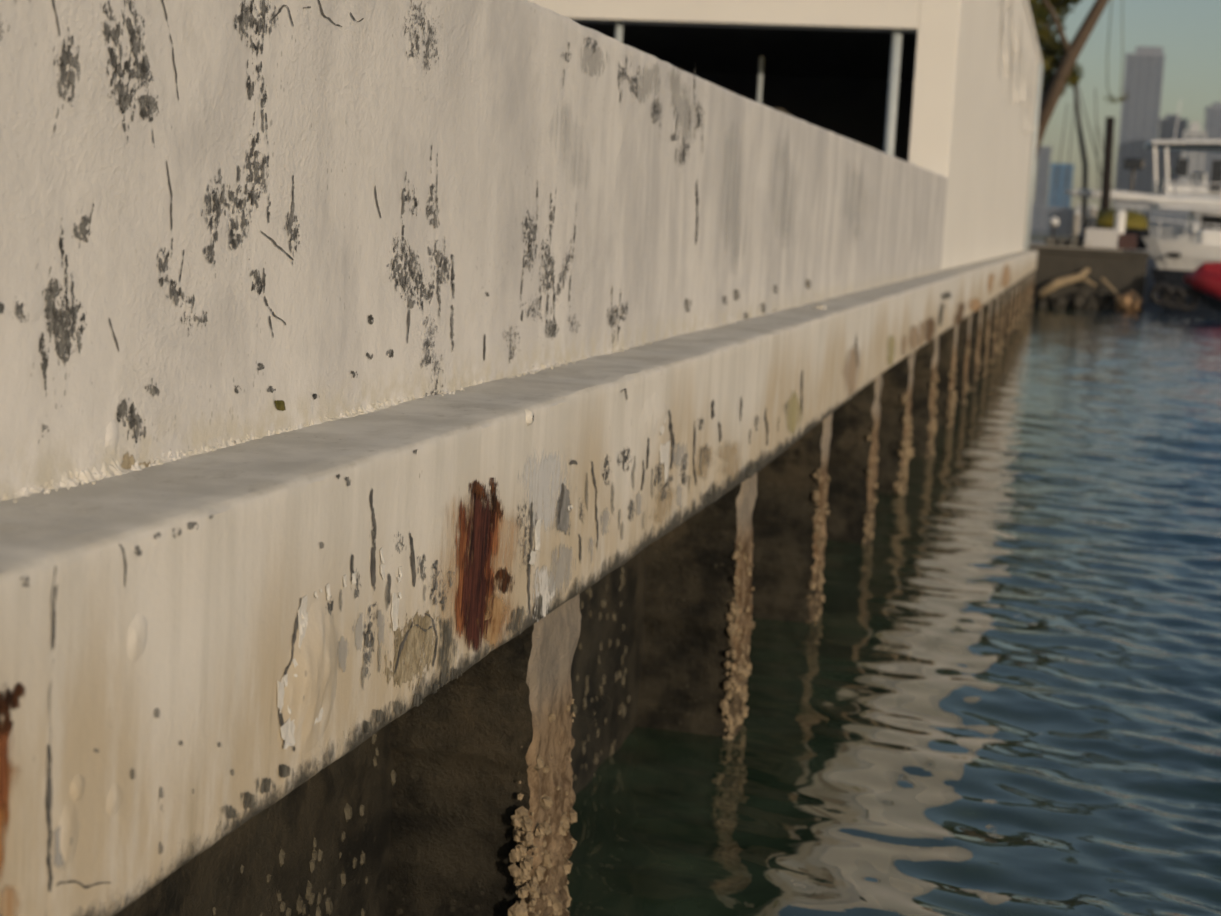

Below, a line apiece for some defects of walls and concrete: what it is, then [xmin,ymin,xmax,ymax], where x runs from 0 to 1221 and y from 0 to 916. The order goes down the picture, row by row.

crack [52,0,60,36]
crack [162,0,179,100]
water stain [702,483,722,504]
rust [449,478,515,651]
spalling [277,488,462,751]
rust [0,683,25,869]
peeling [223,764,294,818]